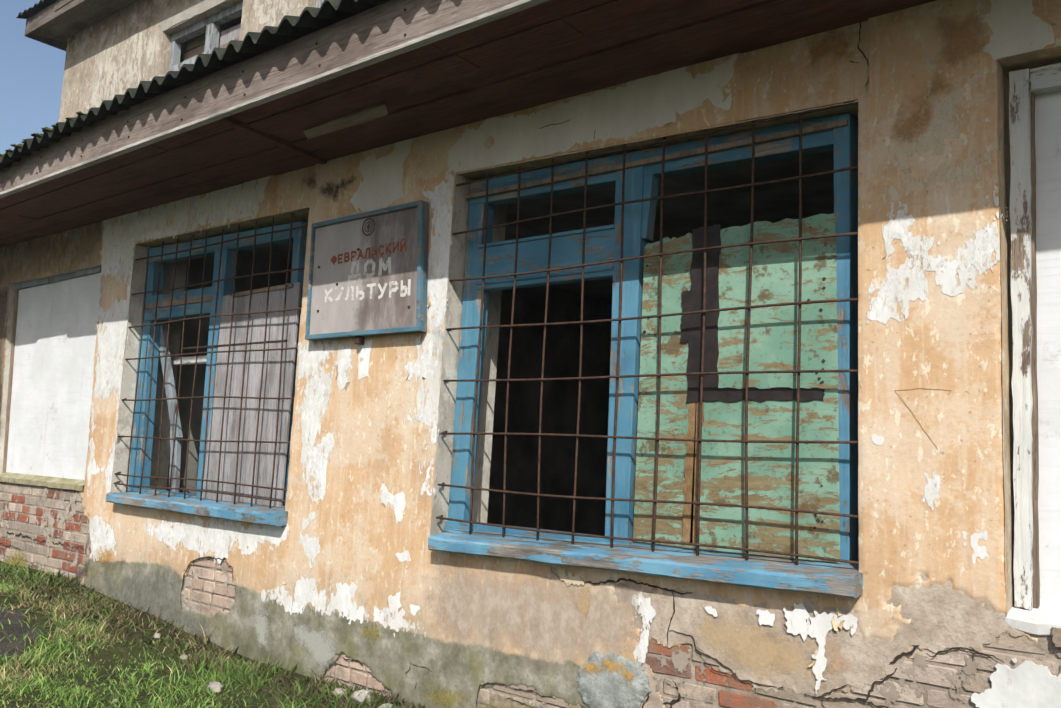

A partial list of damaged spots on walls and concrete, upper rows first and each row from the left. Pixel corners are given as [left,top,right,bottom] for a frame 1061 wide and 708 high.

crack [850,20,869,88]
peeling [979,0,1058,60]
peeling [350,54,738,523]
peeling [866,190,1007,325]
peeling [0,176,270,582]
peeling [144,339,426,637]
water stain [252,613,268,646]
water stain [294,625,335,670]
flaking render [324,655,391,697]
water stain [429,571,634,656]
crack [550,567,1004,708]
flaking render [609,574,1061,708]